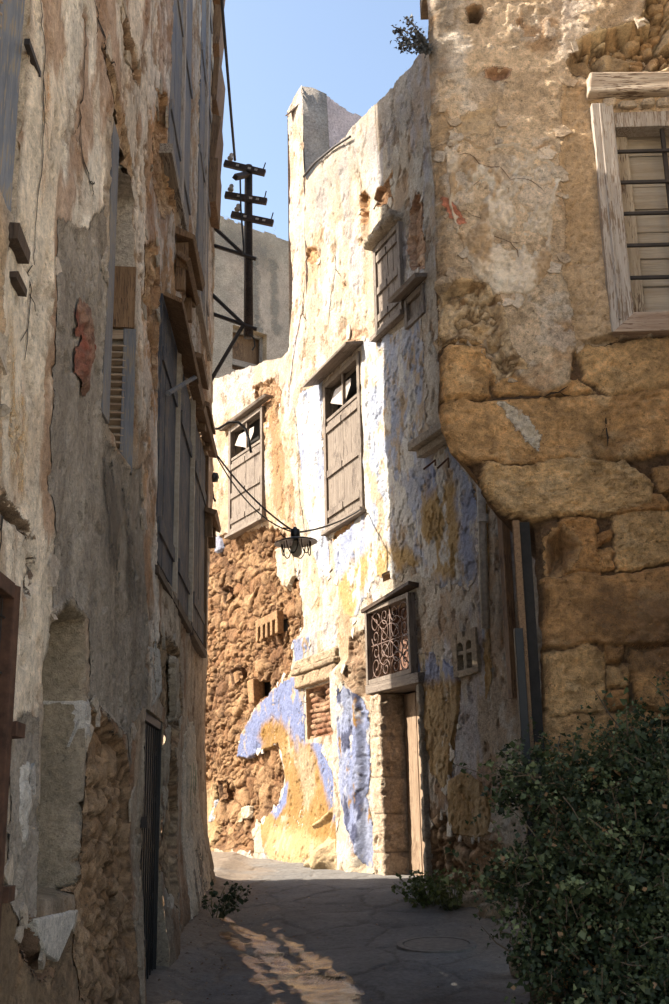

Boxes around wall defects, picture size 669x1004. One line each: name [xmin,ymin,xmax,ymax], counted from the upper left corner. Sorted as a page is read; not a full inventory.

crack [20,0,46,360]
spalling [101,0,142,186]
spalling [150,73,176,219]
spalling [358,170,394,246]
spalling [407,191,426,273]
crack [460,153,544,191]
spalling [429,0,669,384]
spalling [0,256,12,495]
peeling [497,401,543,451]
peeling [43,205,490,1004]
peeling [417,648,514,902]
water stain [218,917,364,1004]